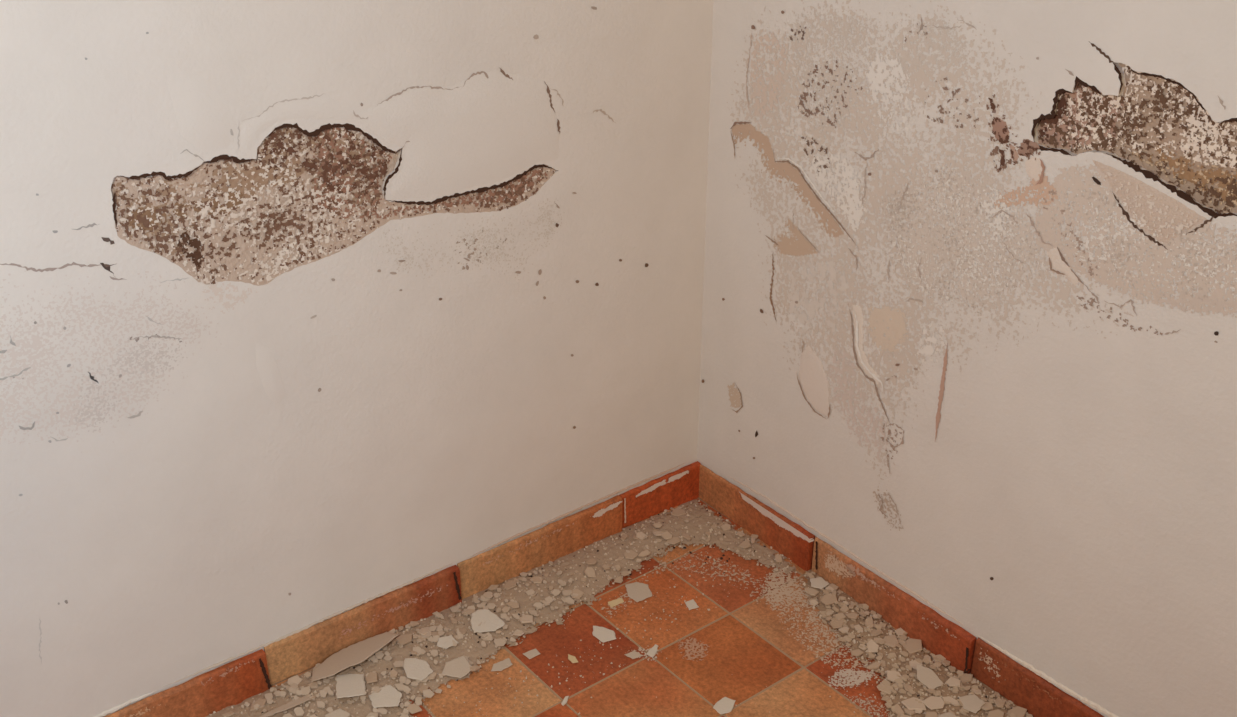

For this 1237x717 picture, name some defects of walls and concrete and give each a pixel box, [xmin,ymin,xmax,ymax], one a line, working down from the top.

crack [0,223,127,280]
spalling [111,123,558,286]